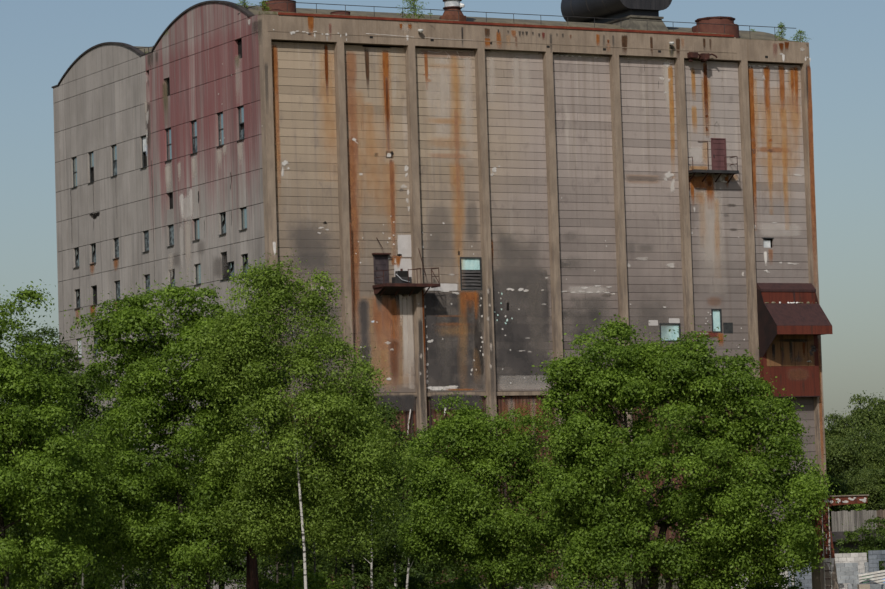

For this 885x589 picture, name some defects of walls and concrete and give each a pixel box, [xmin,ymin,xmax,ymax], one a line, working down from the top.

corrosion [272,45,280,170]
corrosion [382,51,390,142]
damp [180,189,192,261]
corrosion [346,52,360,346]
corrosion [688,175,729,202]
corrosion [748,65,816,261]
corrosion [373,297,400,381]
corrosion [460,291,479,316]